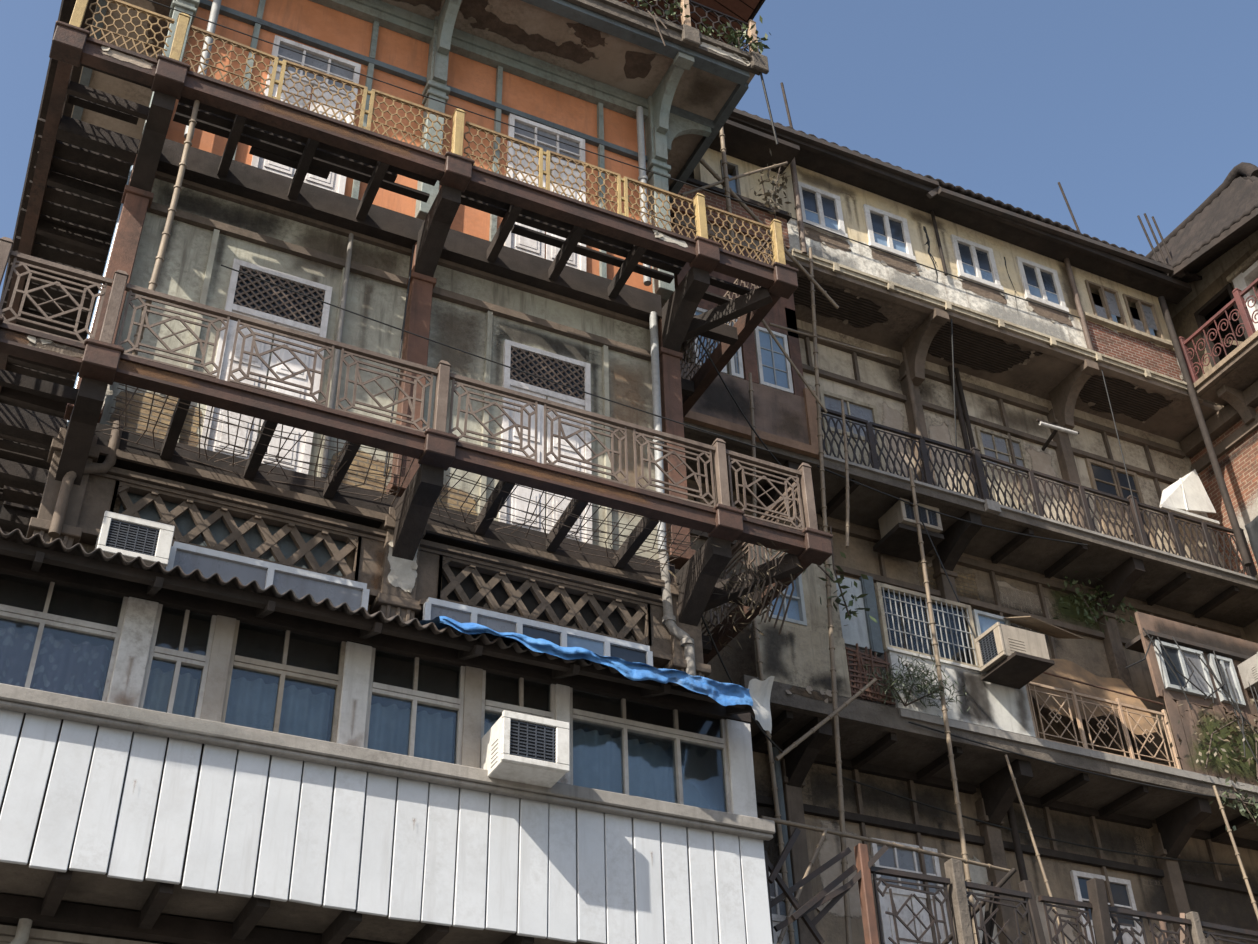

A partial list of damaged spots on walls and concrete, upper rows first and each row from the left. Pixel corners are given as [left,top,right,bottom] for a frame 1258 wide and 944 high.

flaking render [394,0,441,15]
flaking render [459,0,609,63]
flaking render [624,51,656,79]
water stain [1061,267,1079,317]
peeling [388,540,419,593]